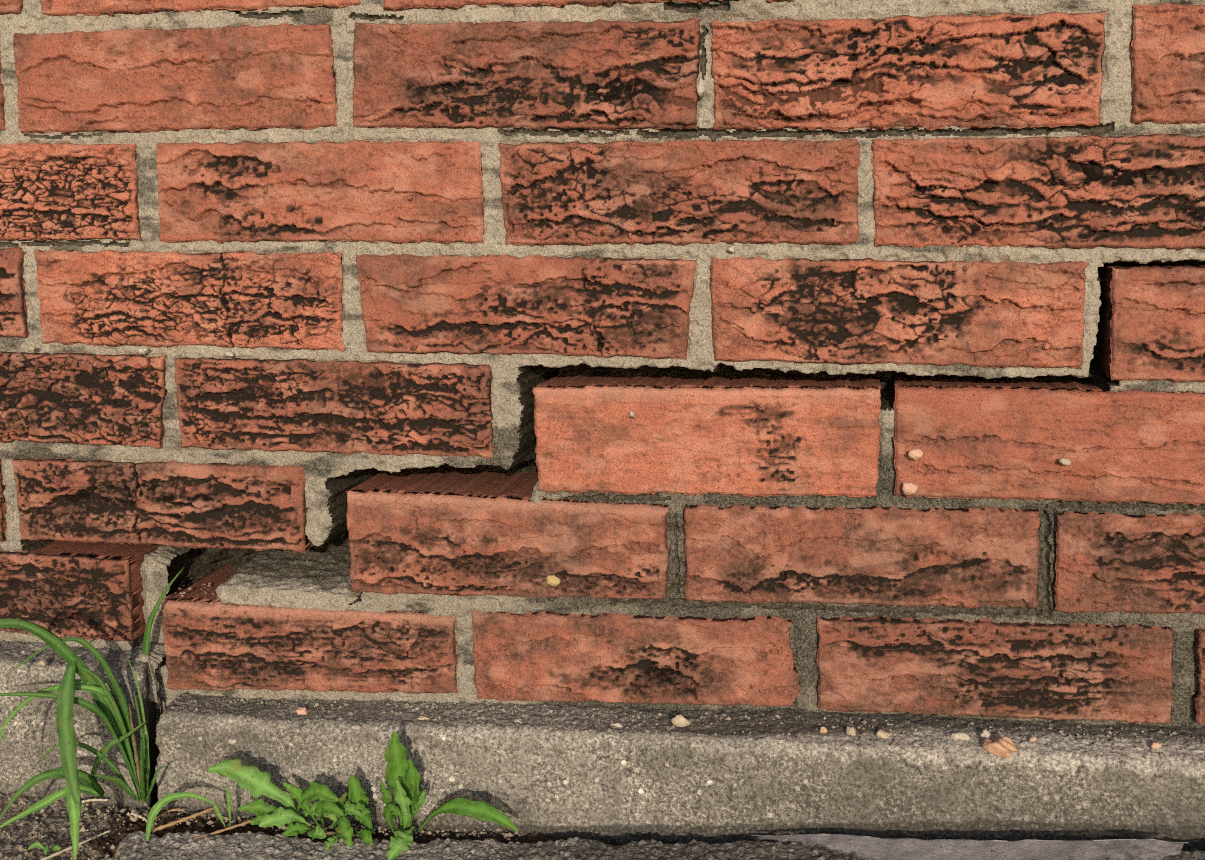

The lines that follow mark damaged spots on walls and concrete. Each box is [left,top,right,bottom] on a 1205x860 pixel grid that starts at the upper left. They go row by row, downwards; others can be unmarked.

crack [312,259,1205,619]
crack [20,539,55,552]
crack [166,548,266,597]
spalling [215,546,361,611]
crack [131,634,166,666]